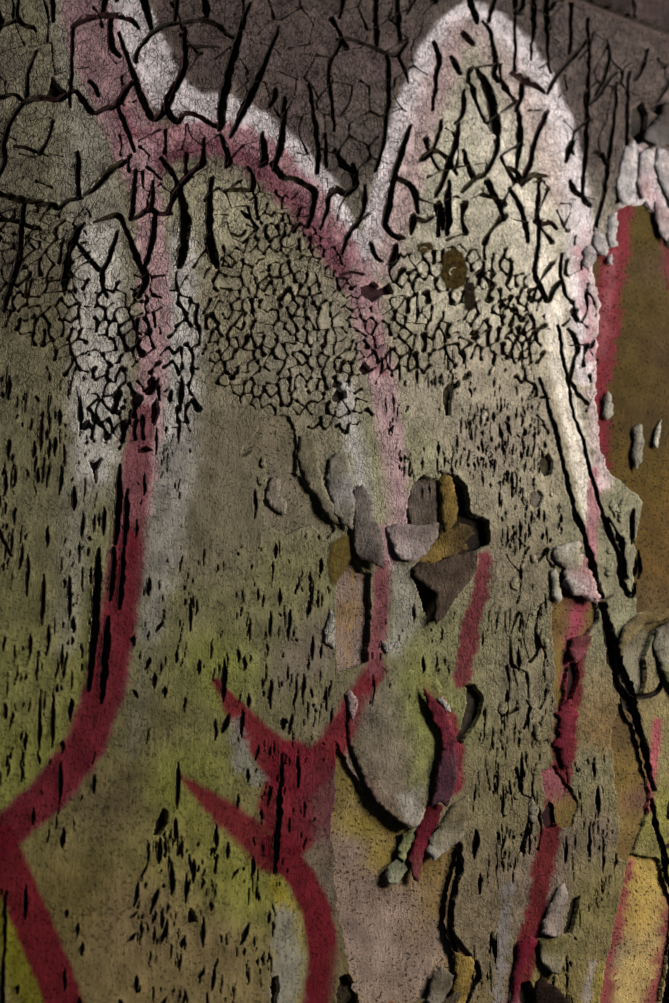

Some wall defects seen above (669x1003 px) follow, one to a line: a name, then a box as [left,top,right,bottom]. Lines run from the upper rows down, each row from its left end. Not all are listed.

peeling [581,212,619,271]
peeling [631,419,662,473]
peeling [296,435,478,625]
crack [0,464,138,848]
crack [370,604,456,721]
crack [436,375,665,895]
peeling [345,679,471,885]
crack [548,748,618,1003]
crack [650,799,669,892]
peeling [426,951,476,1003]
peeling [510,883,569,1003]
crack [661,947,669,1003]